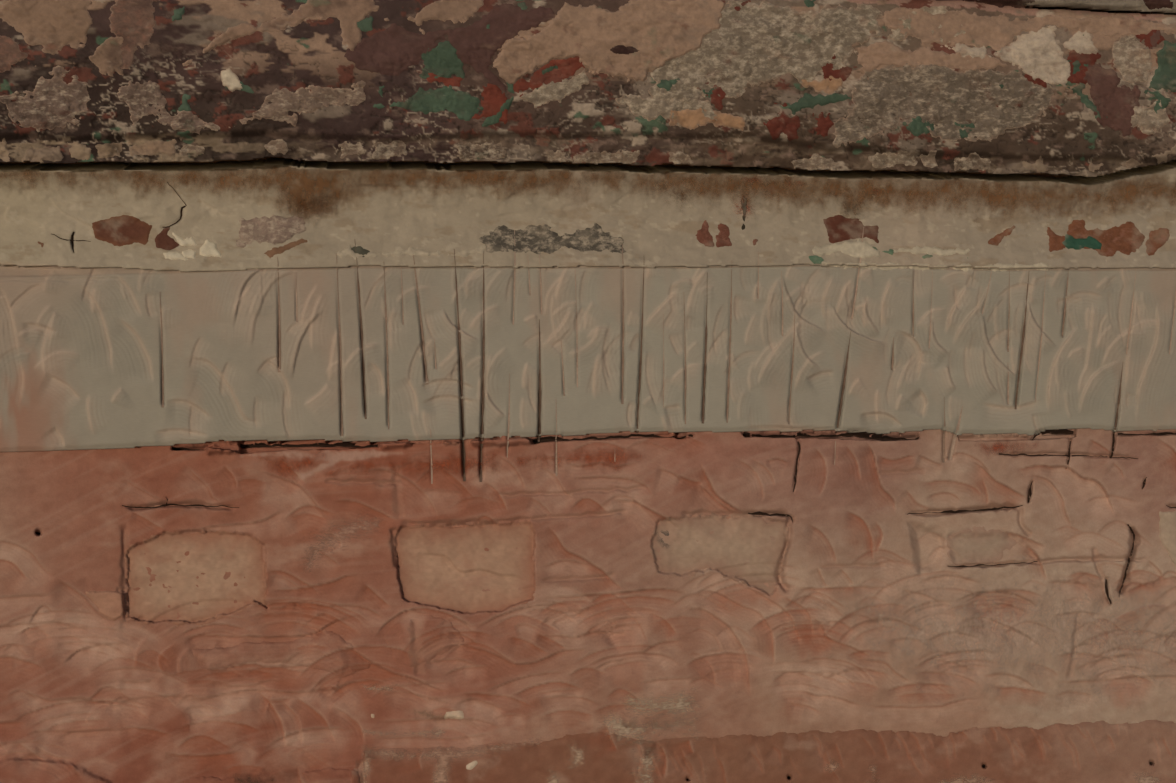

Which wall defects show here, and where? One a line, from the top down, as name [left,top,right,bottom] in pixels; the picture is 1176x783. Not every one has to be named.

peeling [0,0,484,162]
peeling [492,0,1176,174]
peeling [457,142,506,162]
spalling [92,215,222,261]
spalling [236,215,308,258]
spalling [812,215,1170,272]
crack [907,429,1176,515]
crack [948,560,1038,568]
crack [1105,524,1135,604]